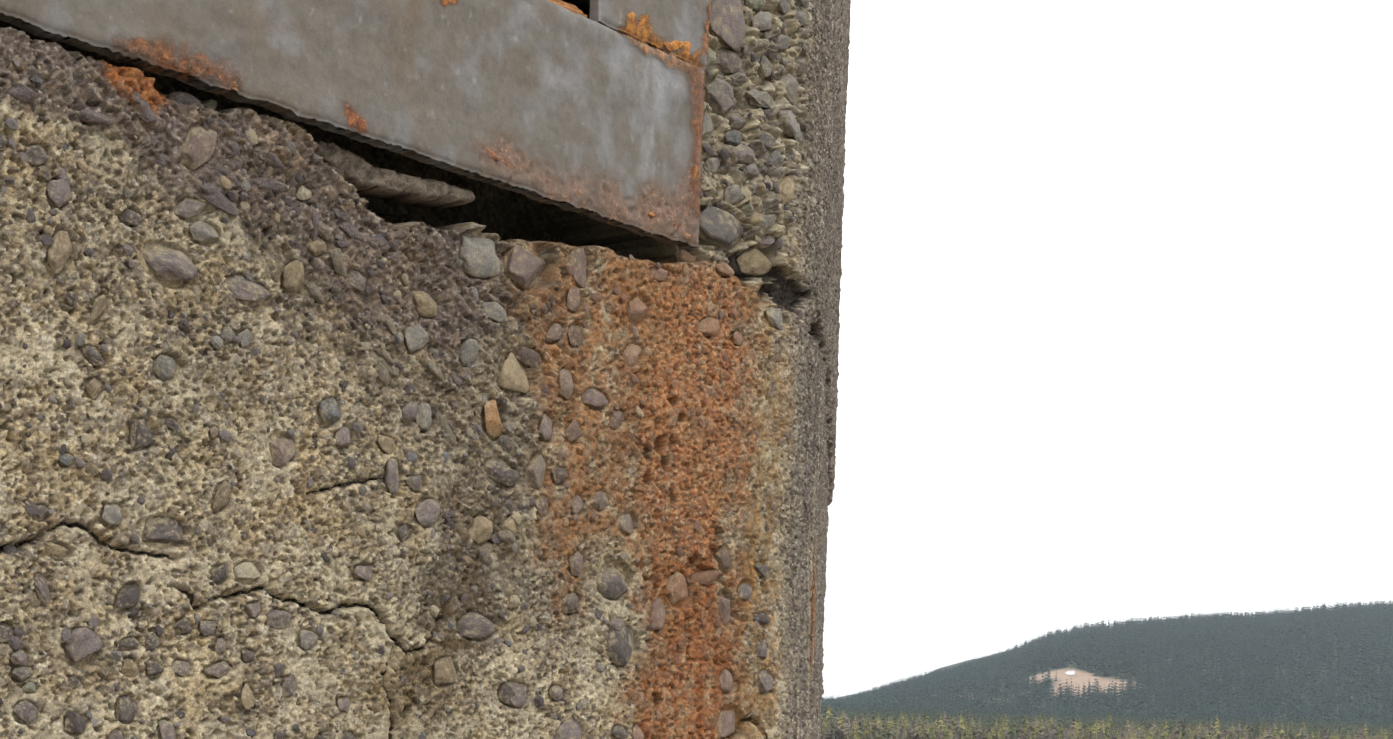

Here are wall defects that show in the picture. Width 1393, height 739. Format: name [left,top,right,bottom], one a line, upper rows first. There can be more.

corrosion [104,37,242,110]
corrosion [345,104,367,132]
corrosion [481,0,711,242]
spalling [0,27,570,616]
crack [306,477,385,494]
corrosion [528,247,789,739]
crack [0,521,451,739]
crack [725,696,767,739]